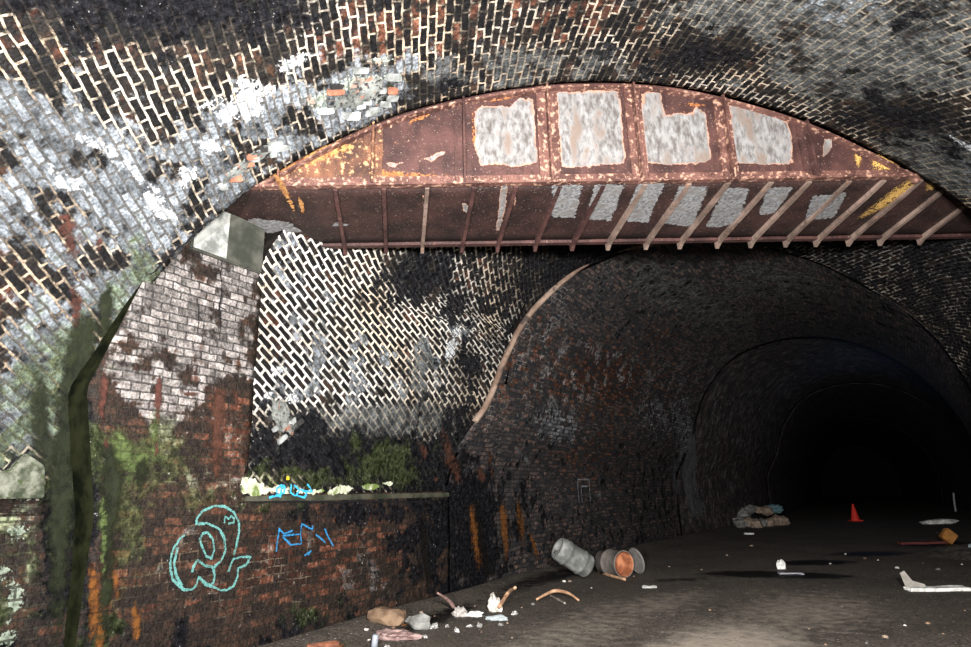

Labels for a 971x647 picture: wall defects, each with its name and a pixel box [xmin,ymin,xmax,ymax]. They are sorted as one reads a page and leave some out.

efflorescence [278,52,309,75]
efflorescence [76,134,178,222]
efflorescence [179,167,197,189]
efflorescence [198,75,276,124]
corrosion [273,141,356,213]
peeling [474,98,538,167]
peeling [557,90,626,168]
peeling [641,92,711,165]
peeling [729,105,793,165]
corrosion [854,154,898,170]
corrosion [857,179,913,218]
corrosion [470,509,479,557]